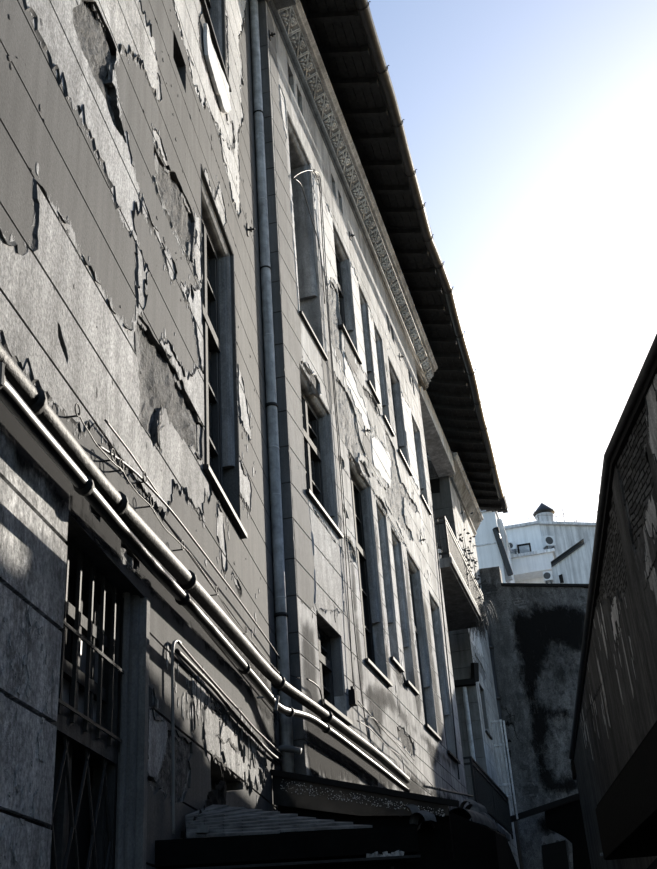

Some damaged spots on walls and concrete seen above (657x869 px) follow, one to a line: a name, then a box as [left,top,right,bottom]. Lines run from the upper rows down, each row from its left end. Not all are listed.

peeling [0,0,255,601]
peeling [148,684,168,786]
peeling [166,643,267,805]